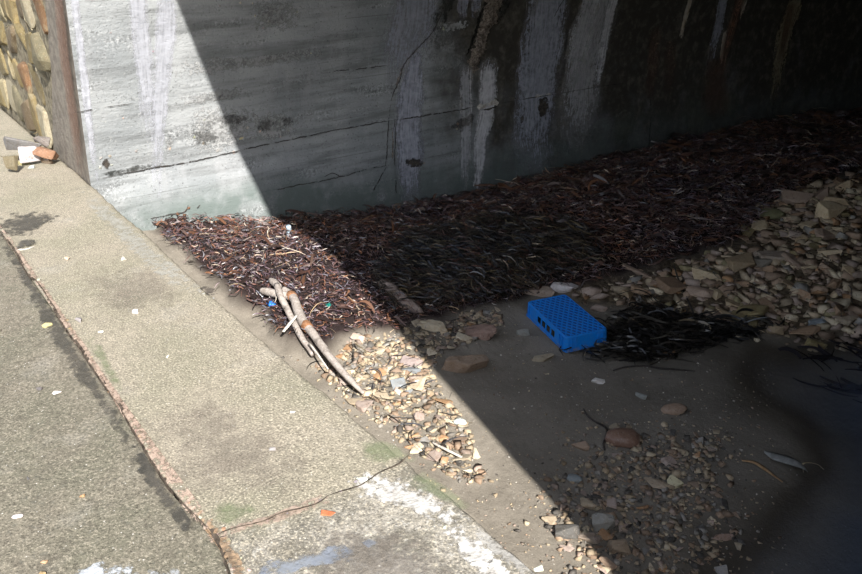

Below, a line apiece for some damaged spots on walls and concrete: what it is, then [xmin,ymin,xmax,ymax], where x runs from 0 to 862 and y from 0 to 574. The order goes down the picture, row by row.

damp [71,0,93,155]
damp [130,0,175,153]
crack [100,0,473,194]
damp [387,0,480,197]
crack [466,0,503,73]
damp [514,0,618,166]
damp [680,0,692,39]
damp [710,0,727,63]
damp [0,212,191,531]
crack [0,231,408,574]